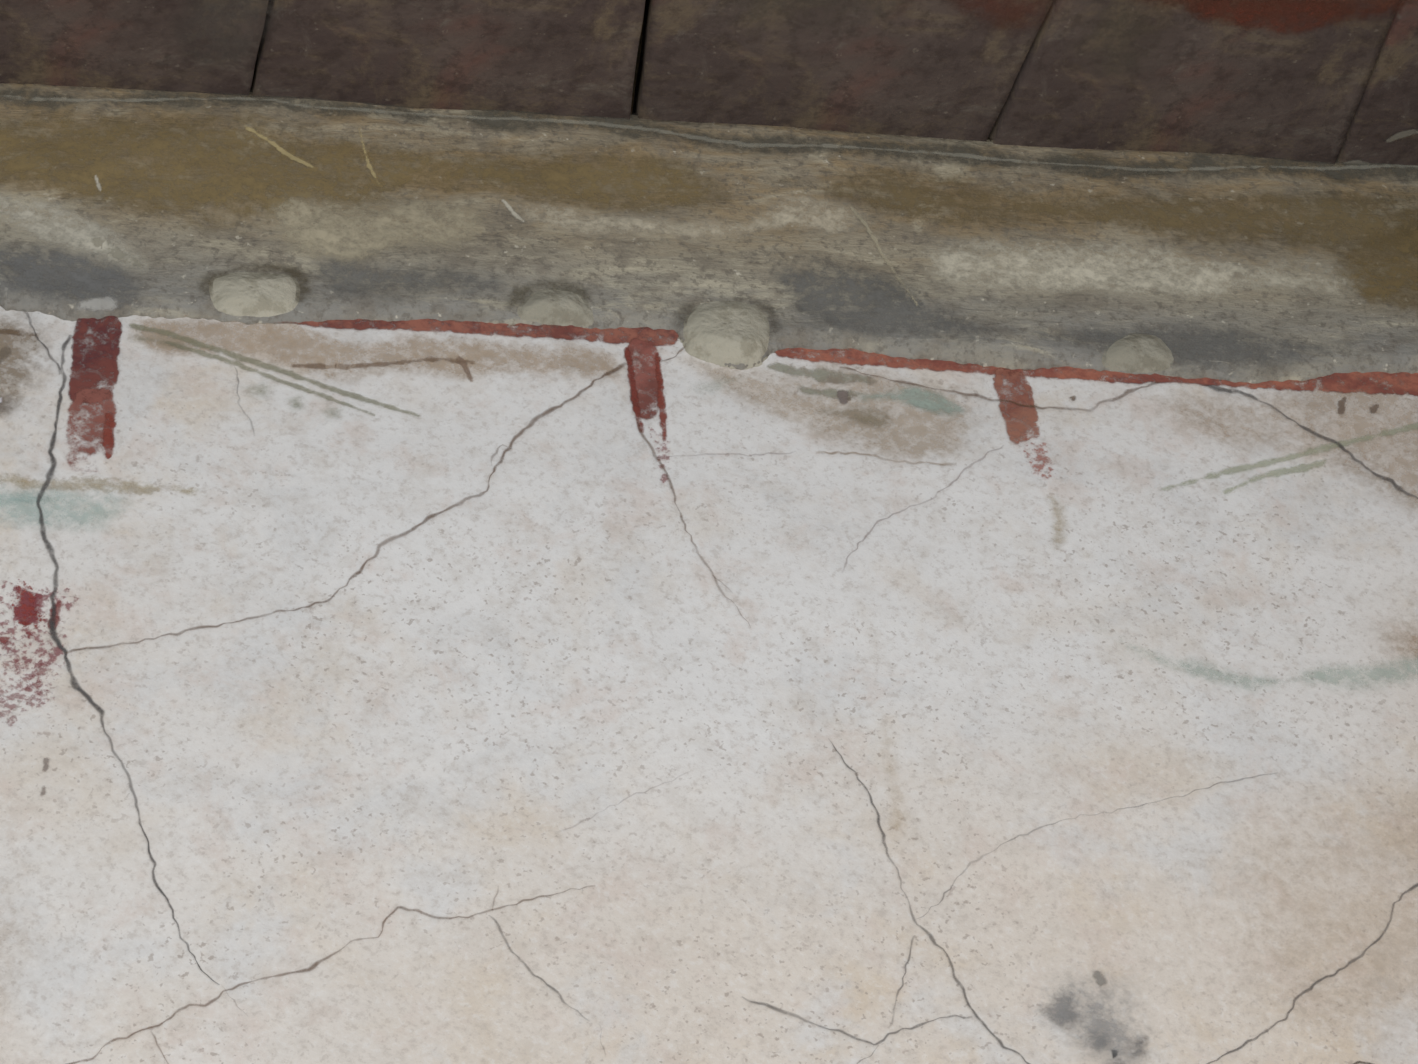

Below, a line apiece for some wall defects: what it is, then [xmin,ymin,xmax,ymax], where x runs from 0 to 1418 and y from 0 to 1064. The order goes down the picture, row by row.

leakage [0,88,1418,310]
leakage [0,323,36,410]
leakage [142,321,613,380]
crack [402,366,622,535]
leakage [726,374,962,454]
leakage [782,271,987,334]
crack [1210,386,1417,498]
crack [34,331,247,743]
crack [833,745,885,838]
crack [117,797,319,1039]
crack [898,928,1030,1064]
crack [1208,884,1418,1064]